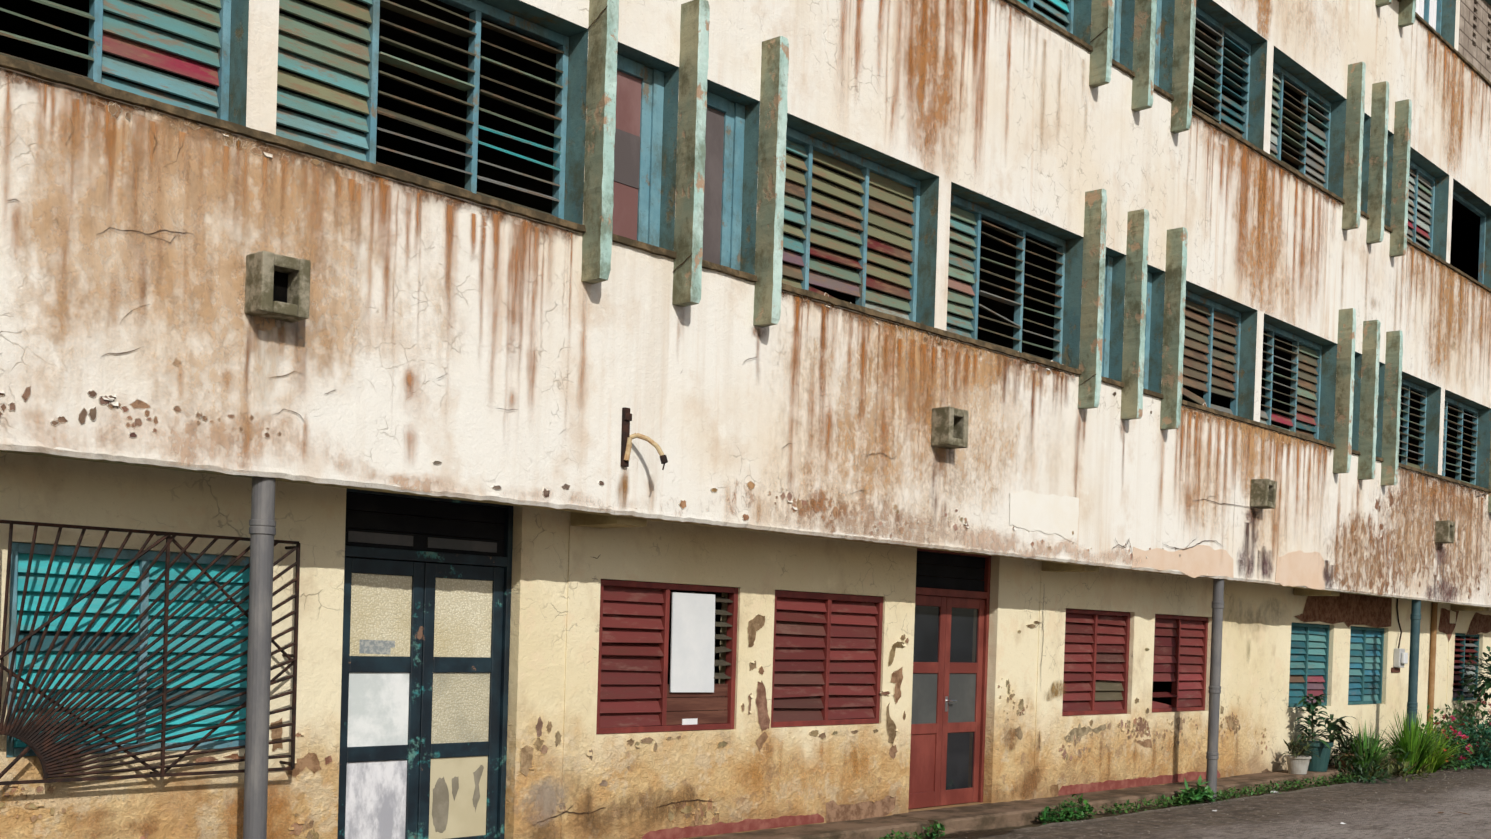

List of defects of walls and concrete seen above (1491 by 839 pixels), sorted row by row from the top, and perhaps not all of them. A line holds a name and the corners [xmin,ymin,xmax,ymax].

flaking render [0,386,31,418]
peeling [1294,487,1491,642]
rust [1327,479,1489,600]
peeling [270,717,333,778]
peeling [519,716,562,777]
peeling [740,614,770,752]
peeling [809,634,909,760]
peeling [1058,697,1198,761]
peeling [1219,706,1271,773]
flaking render [0,784,66,823]
leakage [229,791,244,838]
leakage [267,784,283,839]